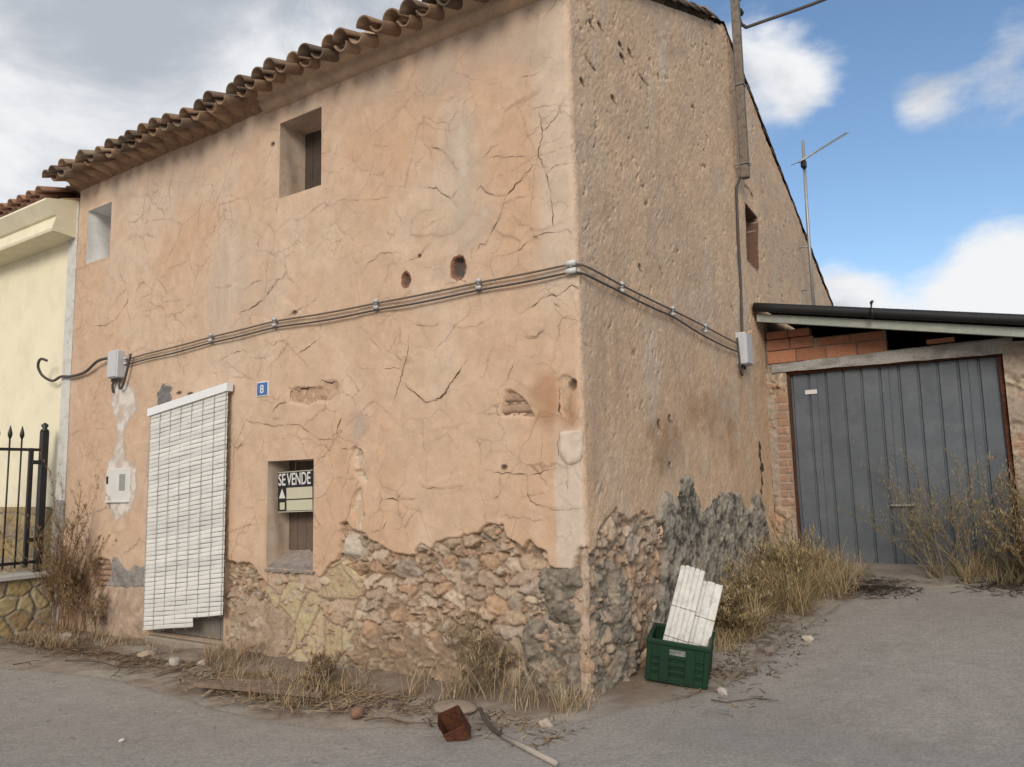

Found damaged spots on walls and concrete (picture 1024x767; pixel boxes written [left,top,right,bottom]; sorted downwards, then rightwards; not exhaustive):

crack [365,104,570,267]
crack [239,381,364,453]
flaking render [291,381,340,405]
crack [372,319,467,405]
flaking render [503,391,535,417]
crack [494,387,582,511]
flaking render [224,449,596,694]